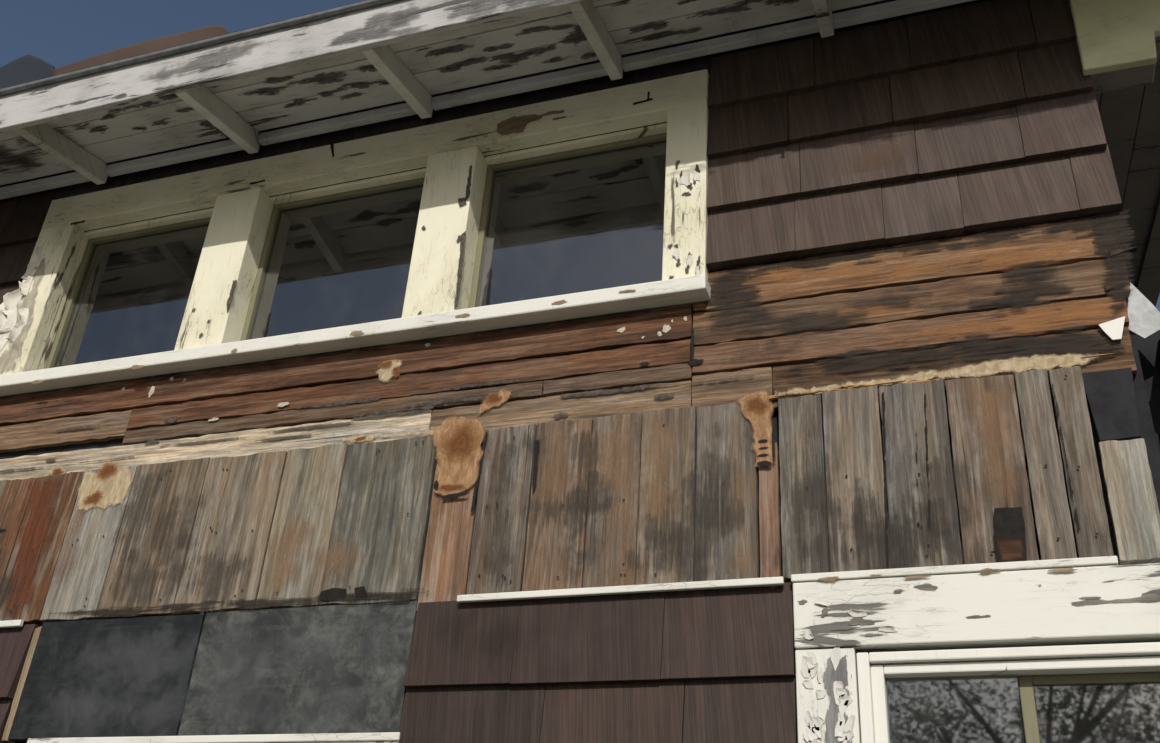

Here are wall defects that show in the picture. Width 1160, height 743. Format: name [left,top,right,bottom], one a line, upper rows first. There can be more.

damp [328,4,429,46]
damp [147,41,258,81]
peeling [675,161,701,196]
peeling [668,244,701,279]
damp [692,212,1119,336]
peeling [0,246,45,373]
damp [472,308,656,334]
damp [206,334,458,373]
damp [776,325,1125,381]
peeling [894,575,938,593]
peeling [1072,589,1160,606]
peeling [801,629,855,743]